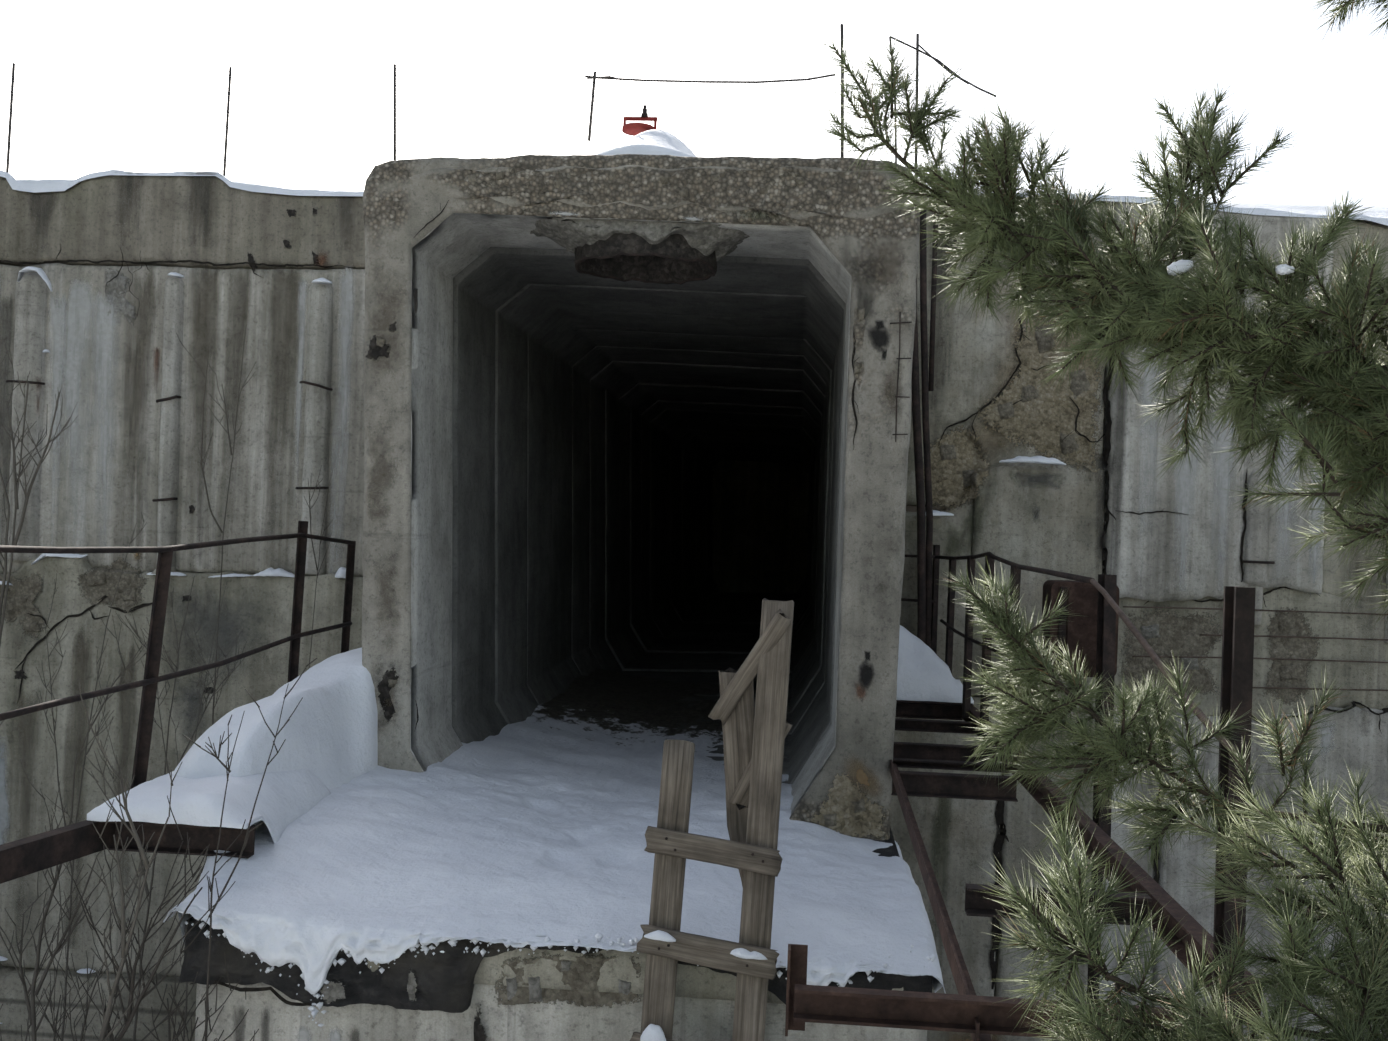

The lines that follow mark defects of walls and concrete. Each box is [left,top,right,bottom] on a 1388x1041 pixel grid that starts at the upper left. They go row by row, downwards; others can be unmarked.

damp [34,192,52,223]
damp [191,172,212,224]
crack [0,244,356,315]
damp [273,269,306,448]
spalling [923,310,1104,509]
crack [1063,354,1188,574]
crack [1194,472,1320,607]
spalling [377,667,399,722]
corrosion [857,651,874,698]
spalling [810,772,888,839]
crack [990,775,1009,989]
spalling [474,952,641,1041]